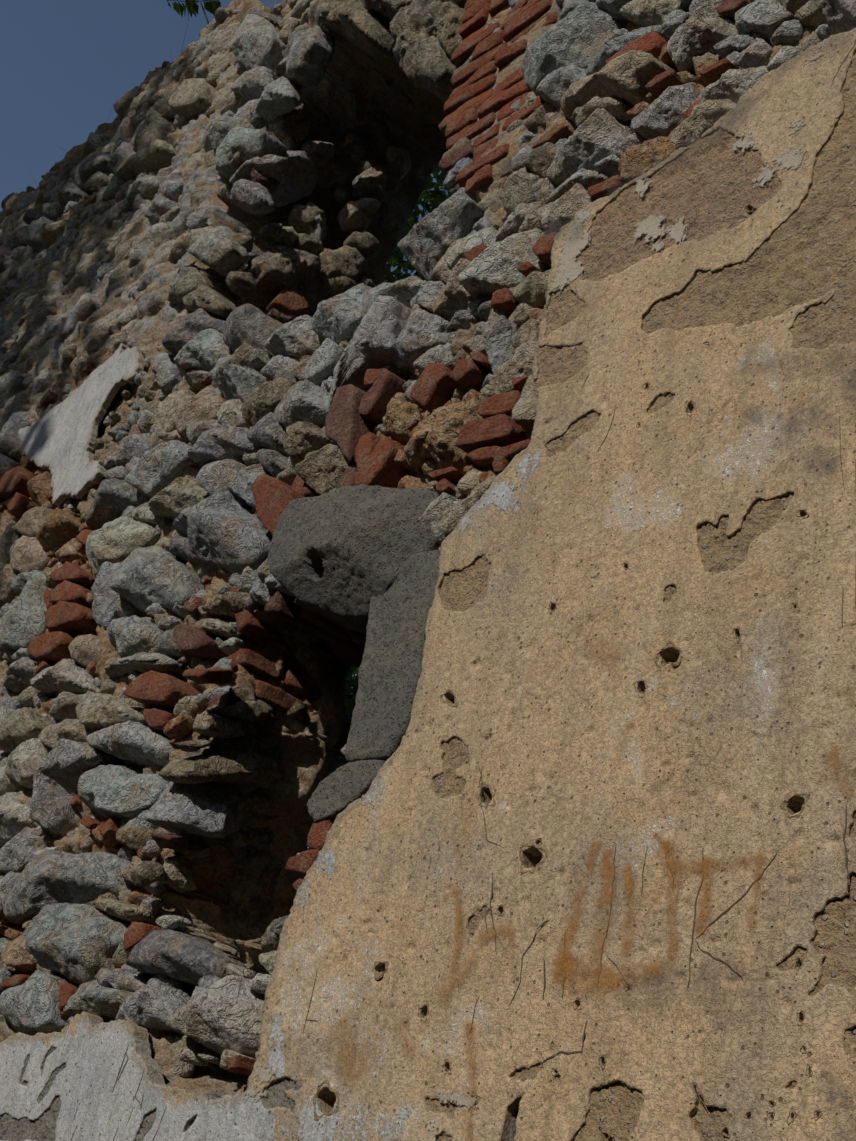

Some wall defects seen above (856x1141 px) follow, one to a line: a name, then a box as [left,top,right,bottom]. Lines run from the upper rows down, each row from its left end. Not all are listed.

spalling [532,52,856,394]
spalling [545,411,601,458]
spalling [698,493,794,575]
spalling [440,555,491,612]
spalling [426,737,469,803]
crack [597,846,627,986]
crack [641,848,779,988]
spalling [776,873,856,996]
spalling [245,1064,306,1113]
spalling [510,1063,543,1082]
spalling [574,1081,644,1141]
spalling [692,1094,729,1141]